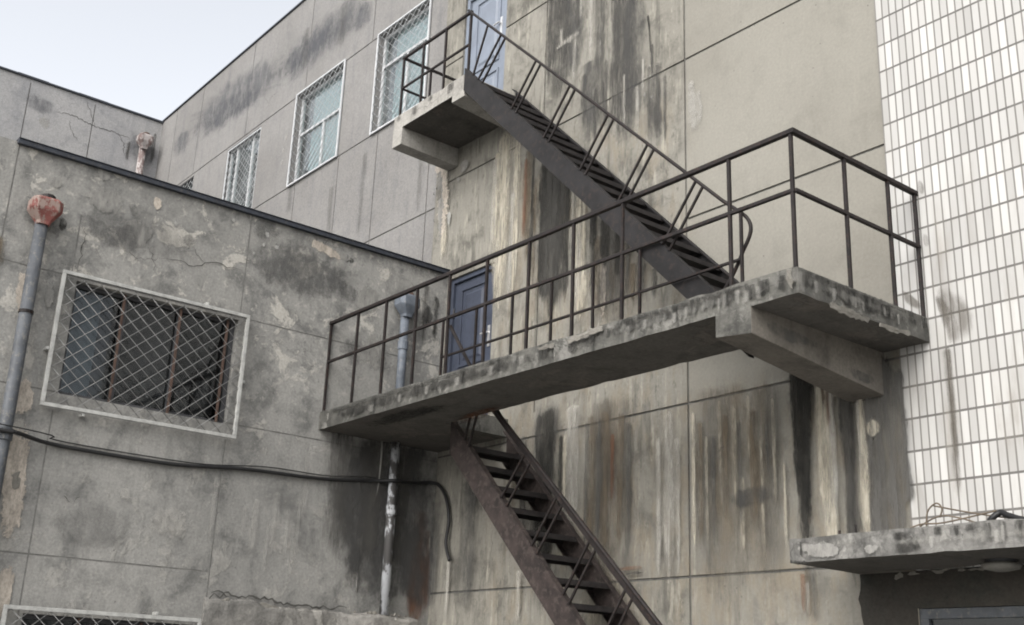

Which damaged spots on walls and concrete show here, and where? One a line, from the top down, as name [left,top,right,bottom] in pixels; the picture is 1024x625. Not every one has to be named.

water stain [547,0,666,137]
crack [61,103,126,153]
crack [125,249,240,273]
water stain [938,297,967,335]
peeling [0,377,35,538]
water stain [330,433,449,603]
water stain [522,407,578,511]
water stain [657,413,679,566]
water stain [691,374,879,565]
peeling [798,542,839,558]
water stain [895,527,941,552]
water stain [948,376,957,448]